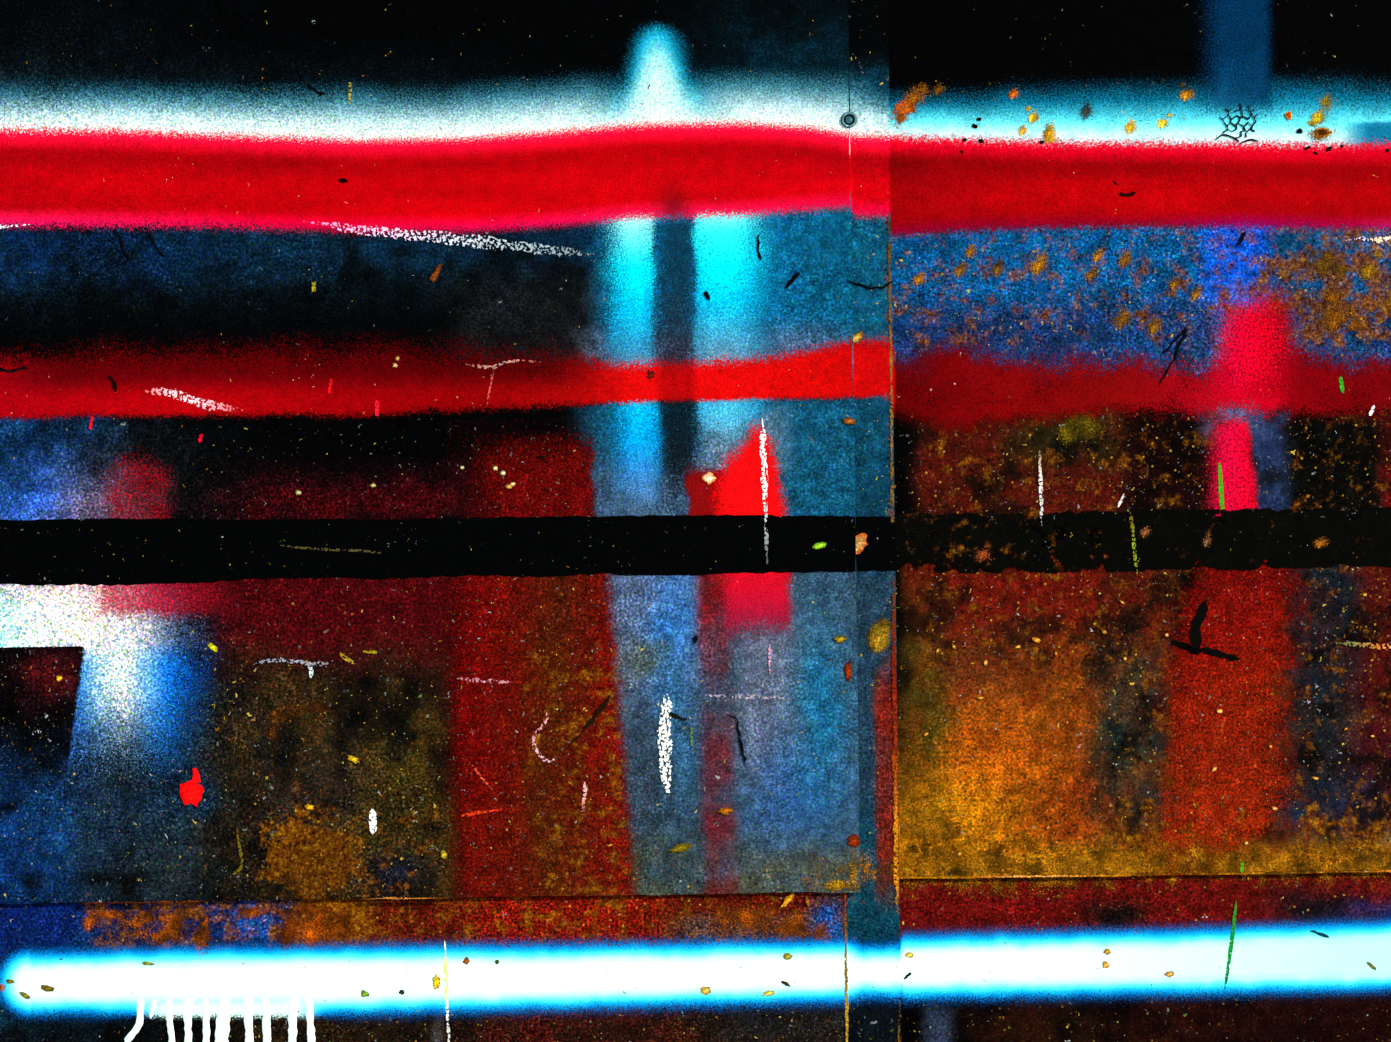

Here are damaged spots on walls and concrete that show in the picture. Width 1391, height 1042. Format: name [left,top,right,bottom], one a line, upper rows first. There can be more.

crack [1216,103,1258,143]
rust [954,244,977,278]
rust [992,258,1006,277]
rust [1030,250,1050,277]
rust [1083,248,1132,283]
rust [1168,277,1202,300]
rust [1307,248,1384,338]
rust [1110,310,1164,336]
crack [0,365,27,373]
rust [230,841,447,950]
rust [82,900,212,954]